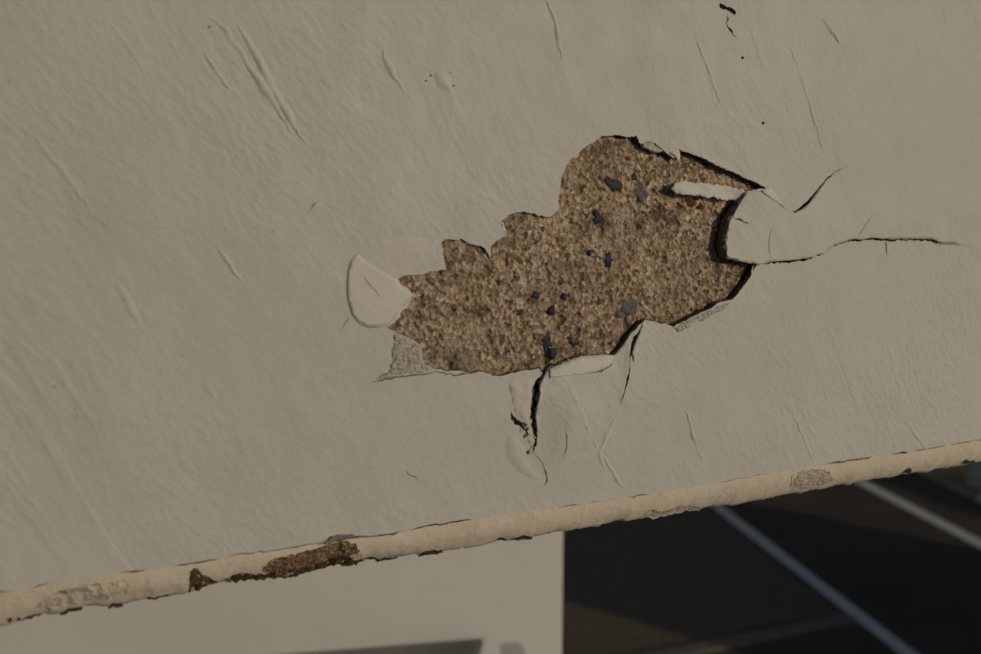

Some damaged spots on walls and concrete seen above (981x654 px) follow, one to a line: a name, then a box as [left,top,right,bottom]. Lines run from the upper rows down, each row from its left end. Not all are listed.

crack [757,170,838,212]
crack [758,217,963,266]
spalling [341,135,765,472]
crack [510,374,548,487]
crack [828,439,981,464]
spalling [188,534,398,593]
crack [174,519,471,566]